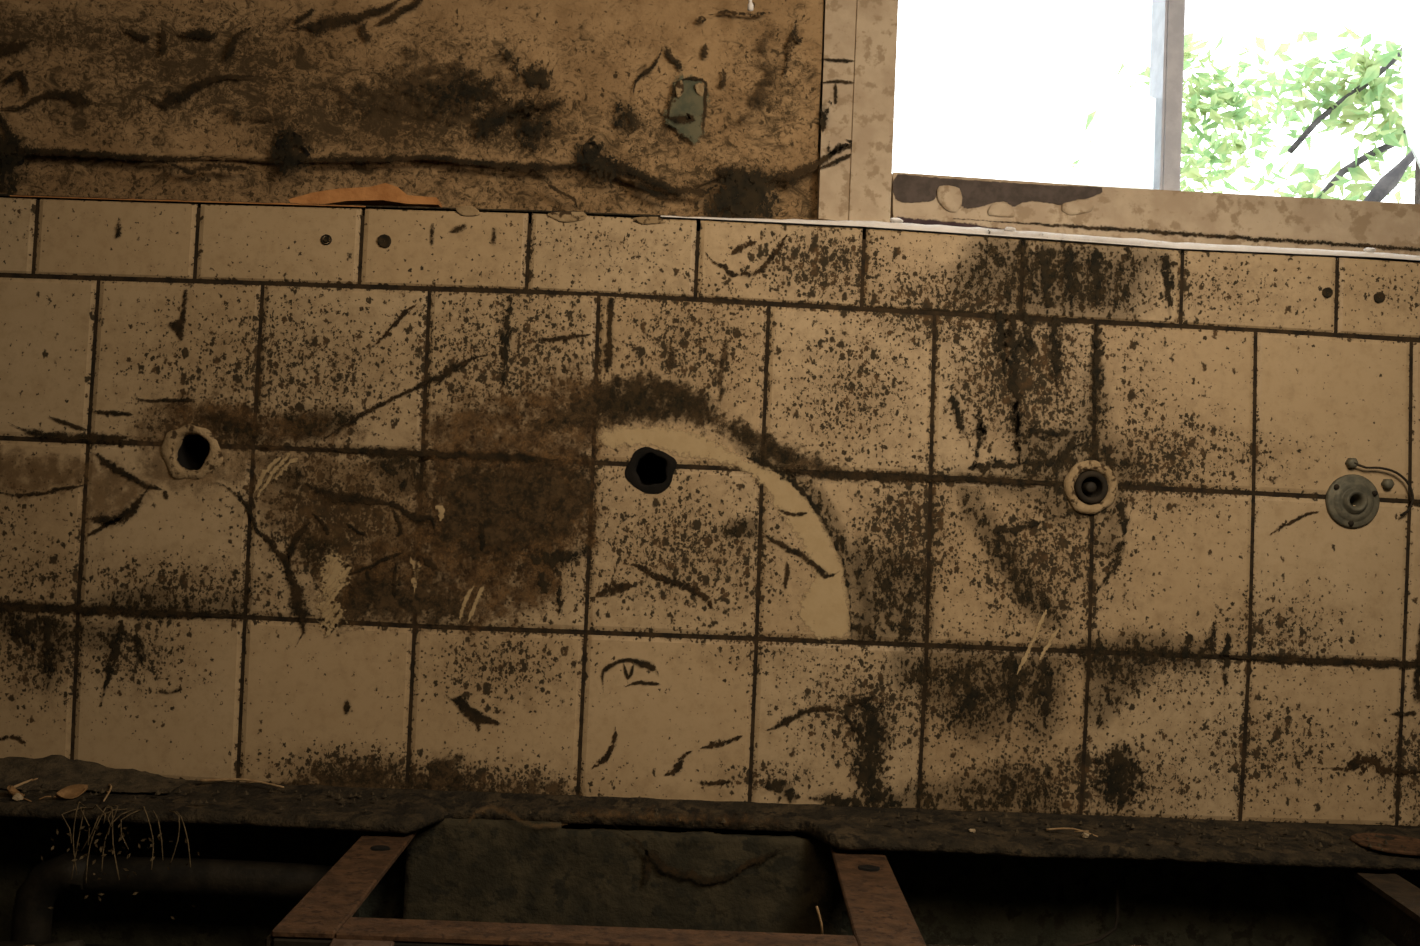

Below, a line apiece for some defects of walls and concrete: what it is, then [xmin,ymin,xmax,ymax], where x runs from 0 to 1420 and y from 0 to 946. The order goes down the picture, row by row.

crack [0,10,854,208]
crack [0,393,196,536]
leakage [307,445,558,494]
leakage [529,230,1419,742]
crack [219,483,437,644]
leakage [0,582,251,706]
leakage [848,693,1073,814]
leakage [1091,739,1149,817]